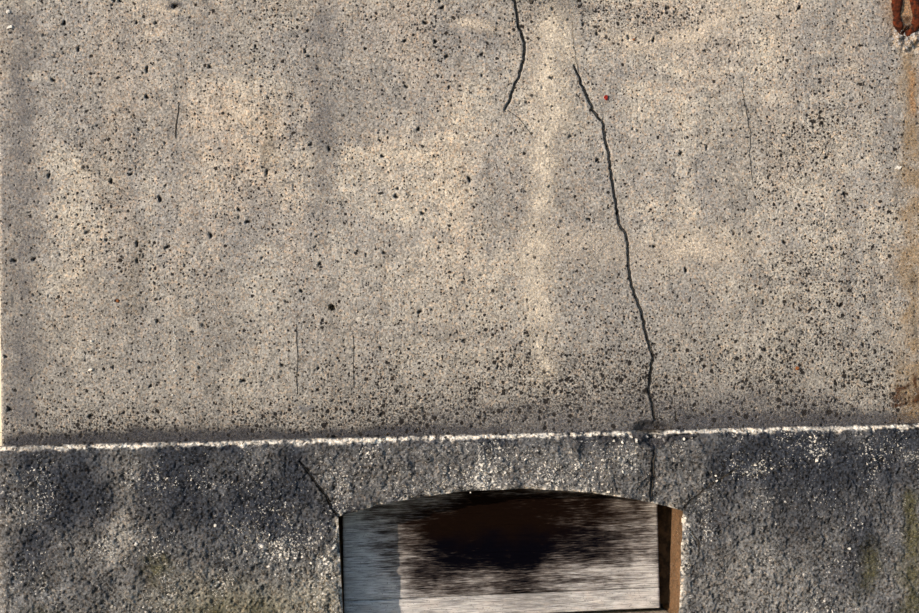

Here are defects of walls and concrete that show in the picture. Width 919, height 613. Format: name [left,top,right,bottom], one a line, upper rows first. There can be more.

corrosion [901,0,912,31]
crack [505,0,533,137]
crack [571,20,656,420]
corrosion [892,376,919,408]
crack [648,455,656,502]